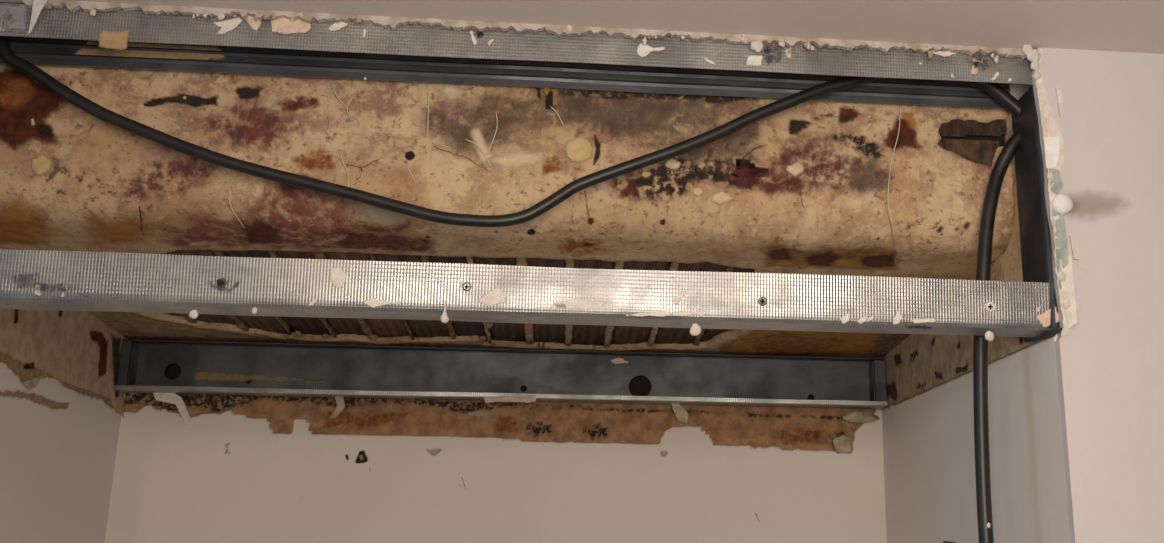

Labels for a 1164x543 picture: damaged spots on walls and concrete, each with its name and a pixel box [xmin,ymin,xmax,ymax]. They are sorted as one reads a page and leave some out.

leakage [0,203,51,244]
leakage [60,157,214,242]
leakage [209,103,283,146]
leakage [173,175,432,252]
mould [654,123,758,163]
mould [748,134,887,193]
peeling [1049,169,1063,195]
peeling [1055,214,1080,329]